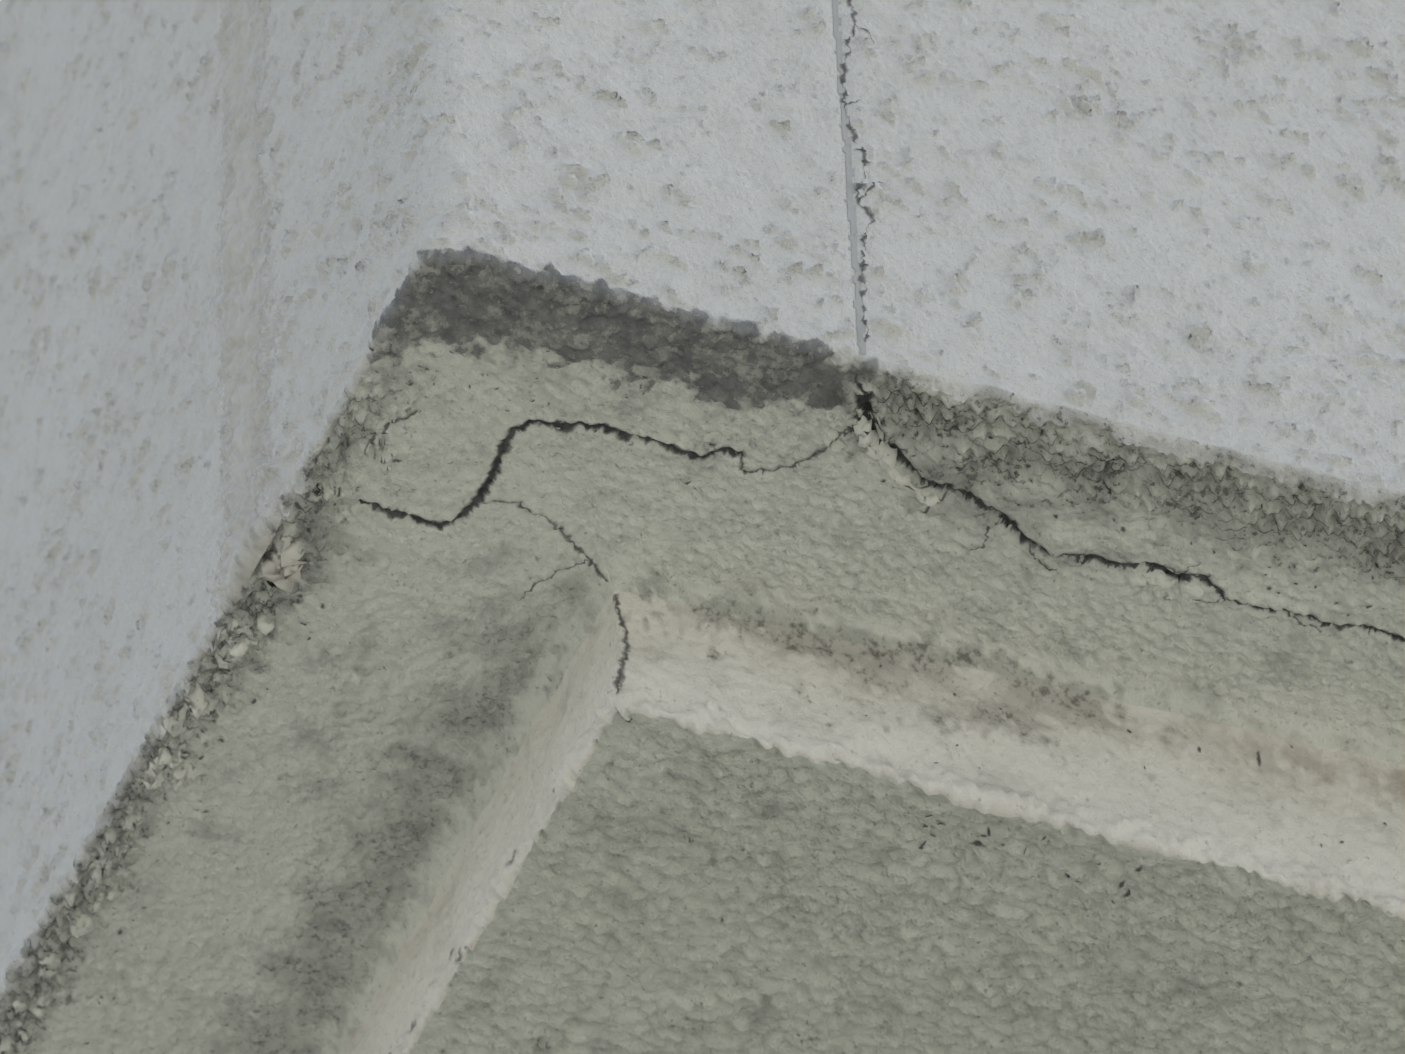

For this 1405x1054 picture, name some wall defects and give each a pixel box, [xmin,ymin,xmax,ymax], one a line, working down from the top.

crack [840,0,882,342]
water stain [272,417,373,540]
crack [359,374,1405,694]
water stain [369,246,1405,594]
water stain [0,558,322,1052]